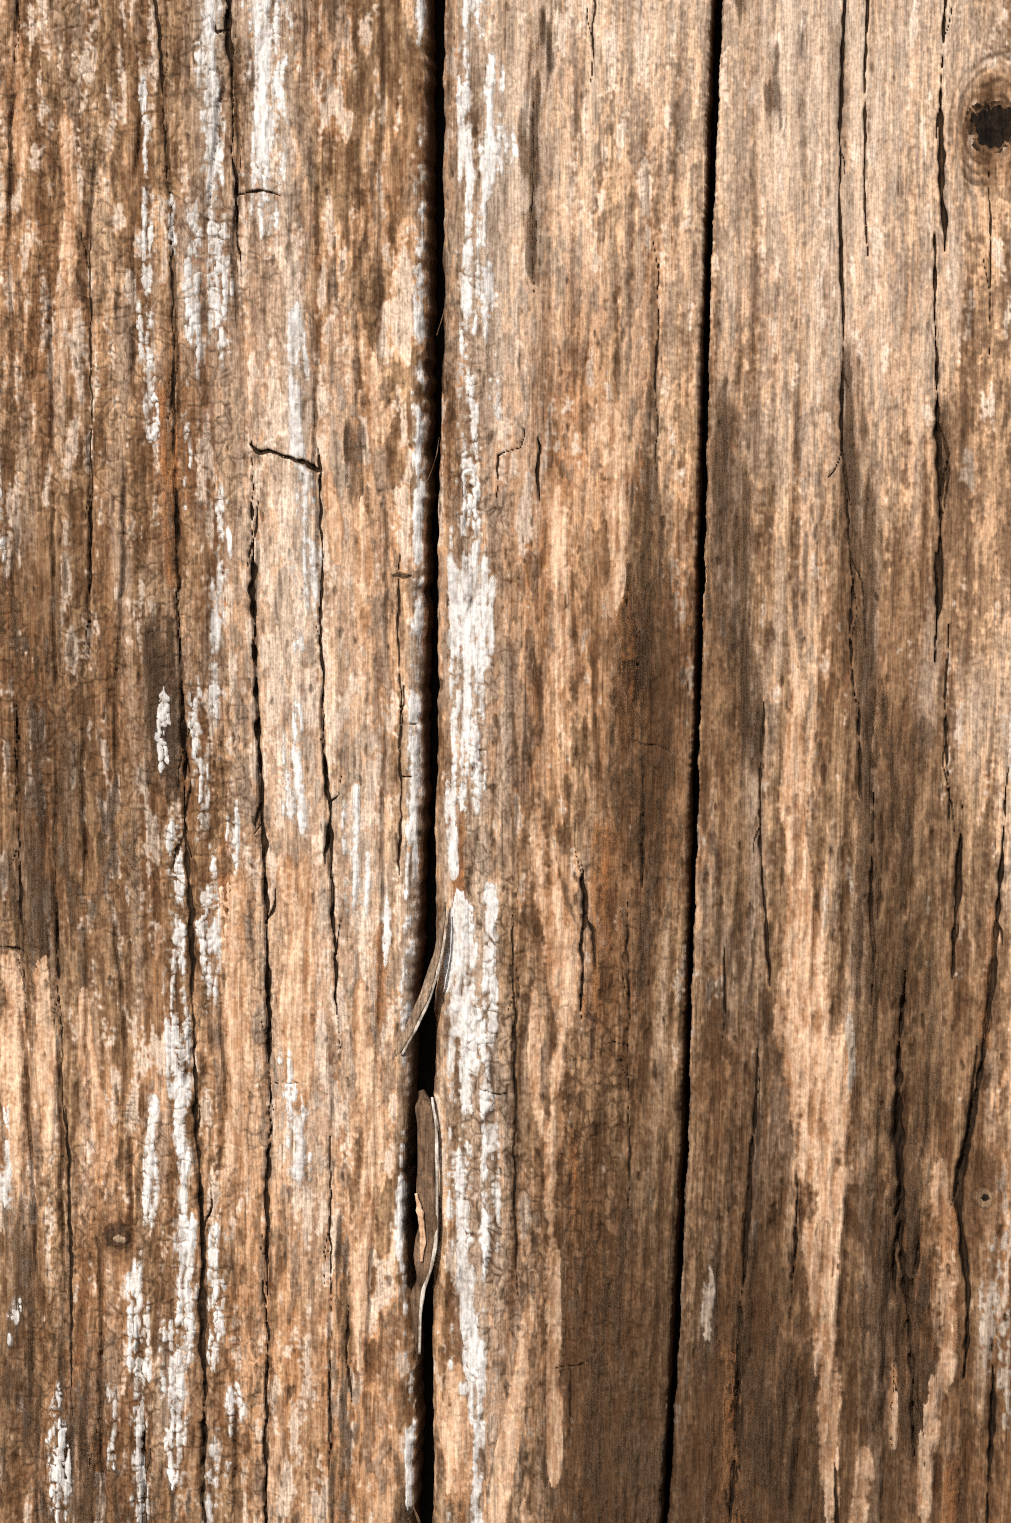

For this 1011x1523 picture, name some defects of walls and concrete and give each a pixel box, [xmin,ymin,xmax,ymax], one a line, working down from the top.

crack [247,441,342,1523]
crack [323,1136,352,1476]
crack [828,0,1009,1523]